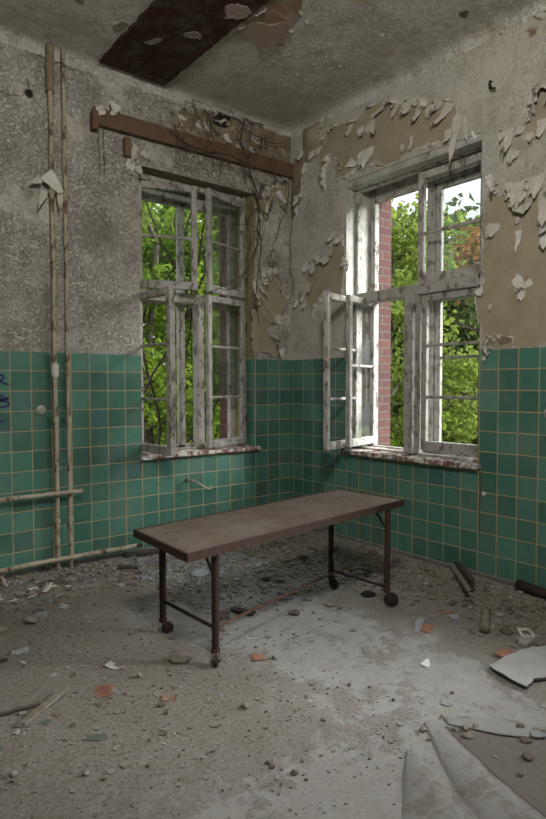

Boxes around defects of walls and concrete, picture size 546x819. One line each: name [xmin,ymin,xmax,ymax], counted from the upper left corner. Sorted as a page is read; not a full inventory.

flaking render [224,0,305,50]
peeling [168,95,478,221]
peeling [497,79,546,165]
peeling [474,173,546,362]